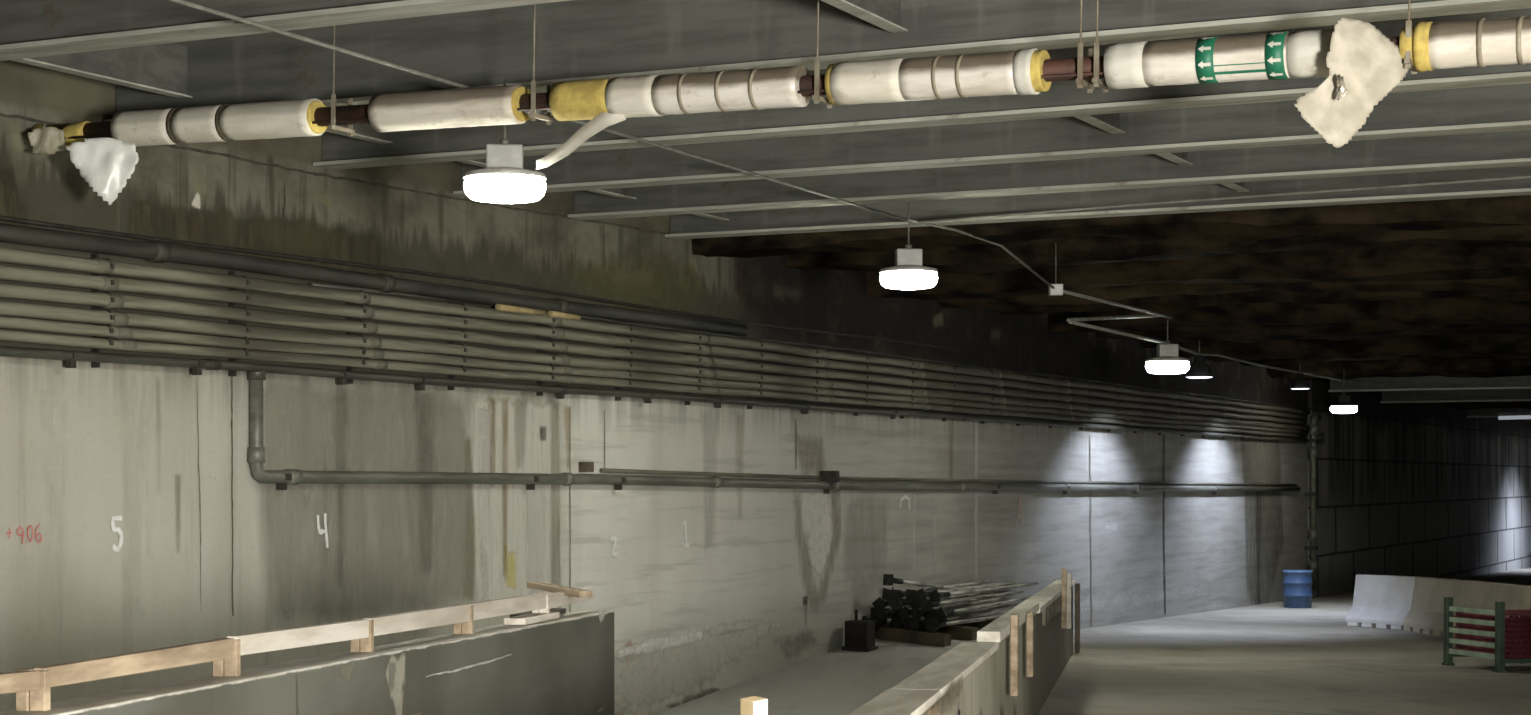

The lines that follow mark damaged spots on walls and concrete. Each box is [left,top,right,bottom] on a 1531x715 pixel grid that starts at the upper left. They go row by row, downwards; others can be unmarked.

damp [387,655,405,715]